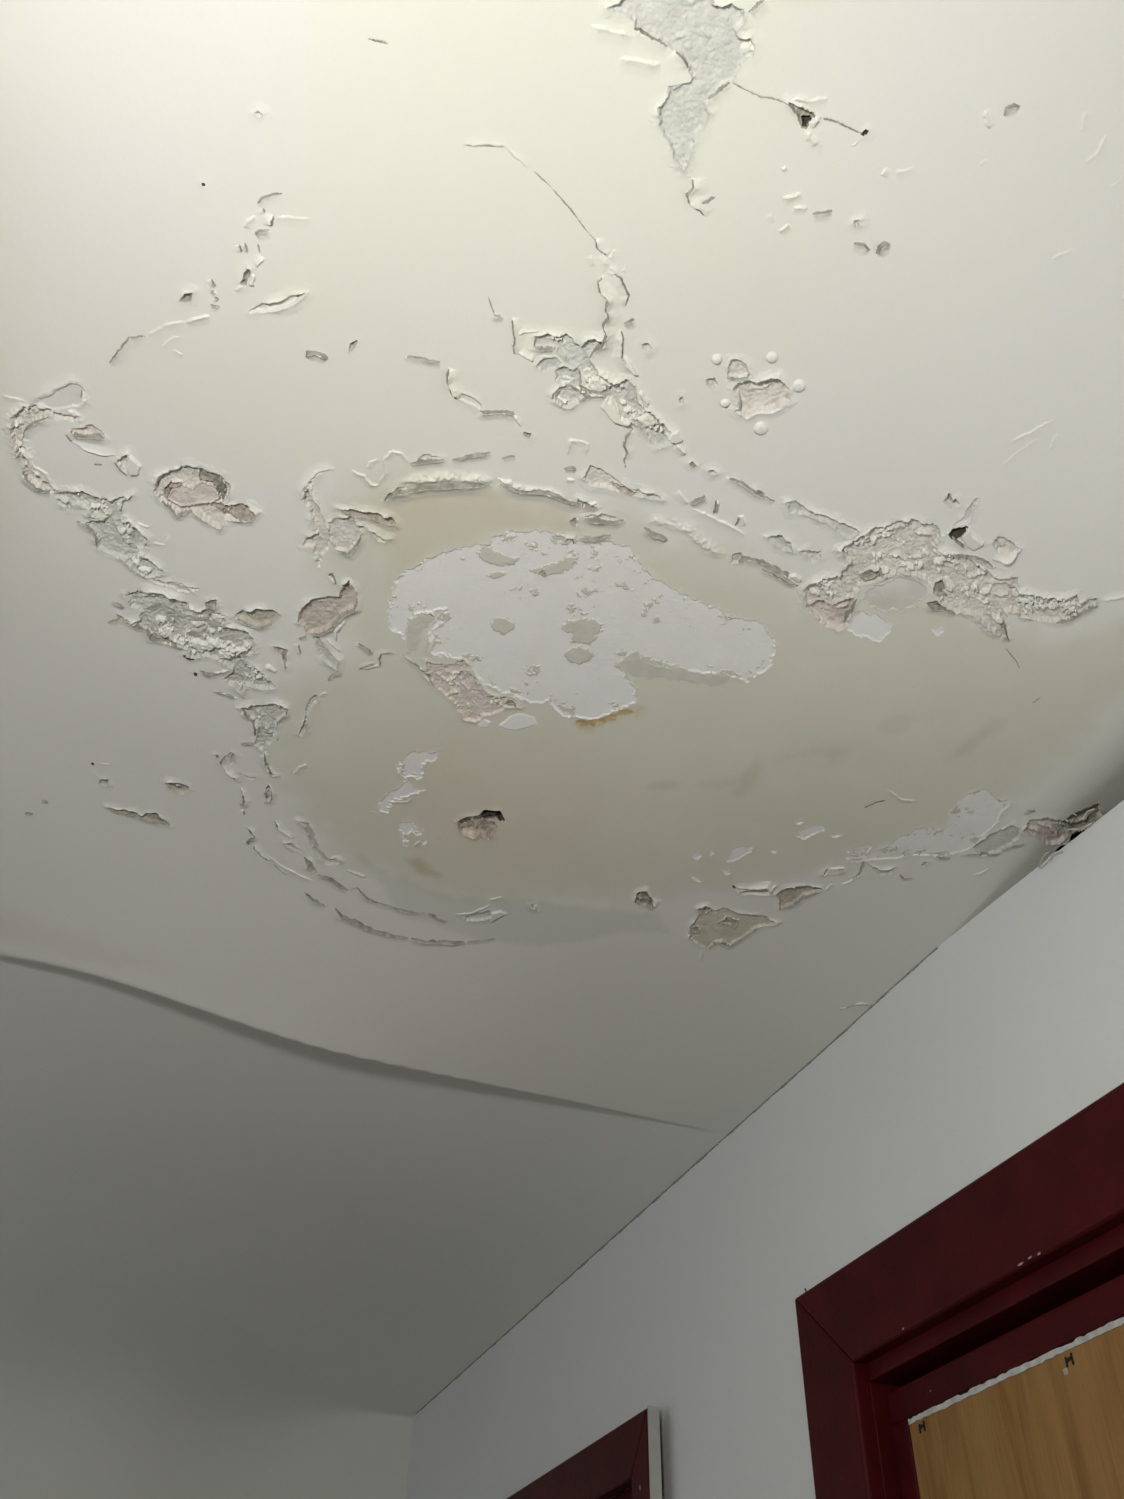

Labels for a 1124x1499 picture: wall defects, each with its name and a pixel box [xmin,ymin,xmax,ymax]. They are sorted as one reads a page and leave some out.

peeling [592,0,766,216]
crack [733,83,874,148]
peeling [1,239,1124,962]
water stain [249,458,1124,950]